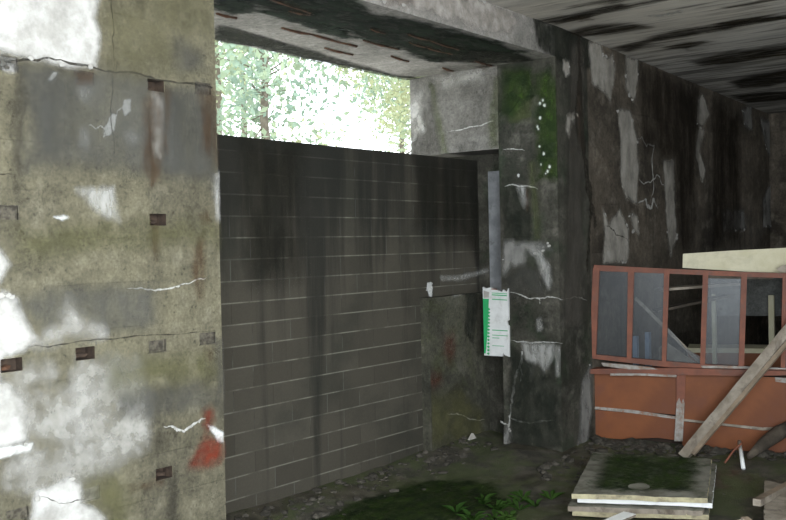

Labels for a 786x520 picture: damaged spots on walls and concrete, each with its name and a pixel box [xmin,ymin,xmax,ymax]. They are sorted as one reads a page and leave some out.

peeling [0,0,100,71]
crack [7,4,212,149]
leakage [215,26,419,80]
leakage [614,15,786,52]
leakage [693,46,786,66]
leakage [534,0,661,325]
crack [127,278,206,291]
peeling [0,293,36,360]
crack [29,330,215,348]
peeling [0,383,33,459]
crack [164,418,206,433]
peeling [31,477,104,520]